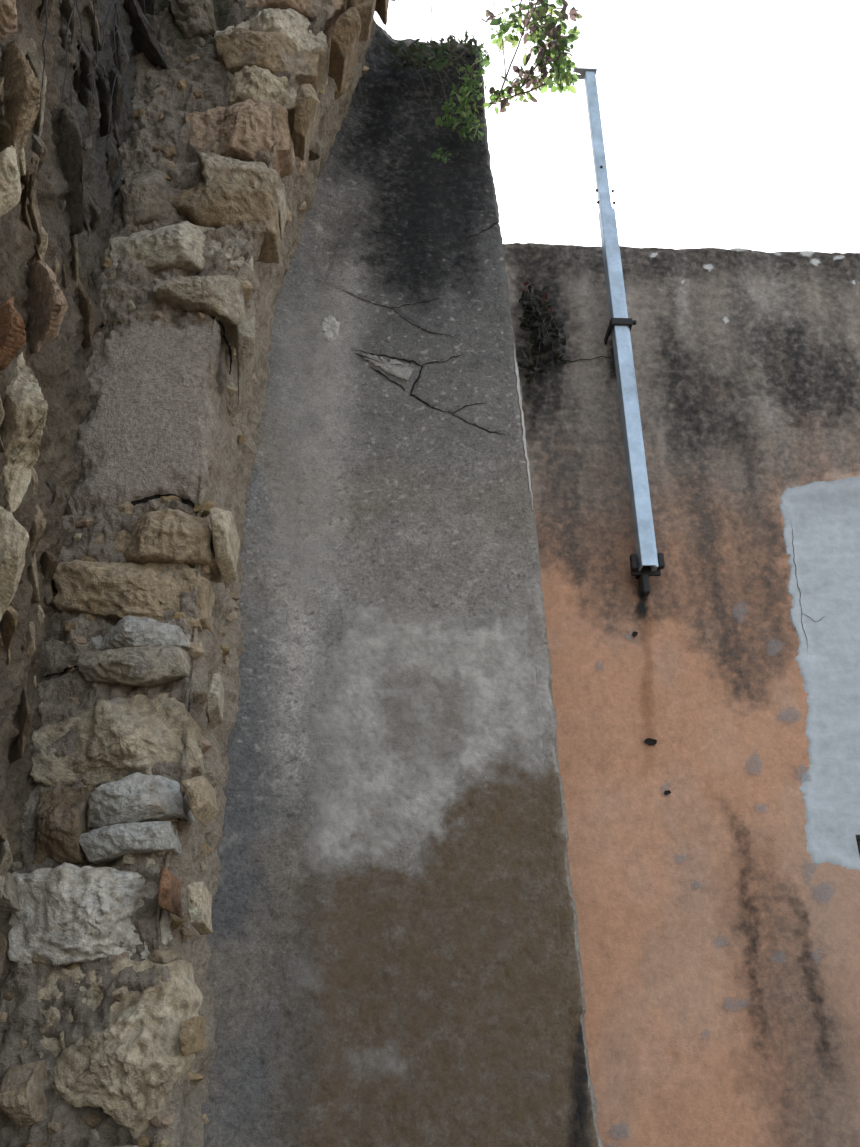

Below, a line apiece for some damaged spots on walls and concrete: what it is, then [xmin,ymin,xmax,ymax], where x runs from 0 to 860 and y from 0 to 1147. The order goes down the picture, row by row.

water stain [330,24,497,292]
crack [333,286,500,434]
water stain [511,246,679,628]
water stain [623,247,860,697]
water stain [298,602,599,1147]